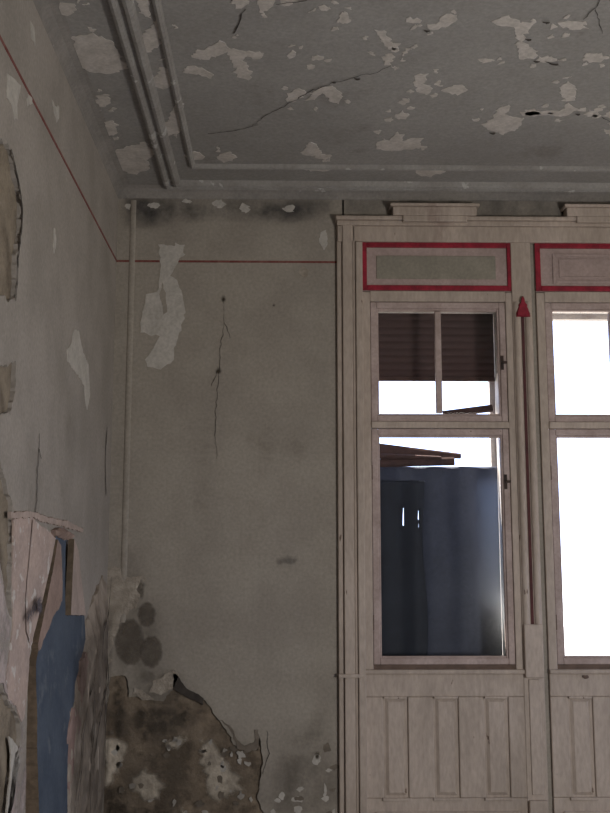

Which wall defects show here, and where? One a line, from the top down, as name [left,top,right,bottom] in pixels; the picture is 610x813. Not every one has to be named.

peeling [71,27,128,74]
peeling [183,34,264,80]
peeling [491,14,589,68]
peeling [95,89,155,175]
peeling [281,82,350,111]
peeling [373,130,427,151]
peeling [384,69,467,122]
peeling [472,76,610,135]
peeling [140,243,186,370]
peeling [66,328,90,410]
damp [116,581,162,667]
flaking render [0,694,20,813]